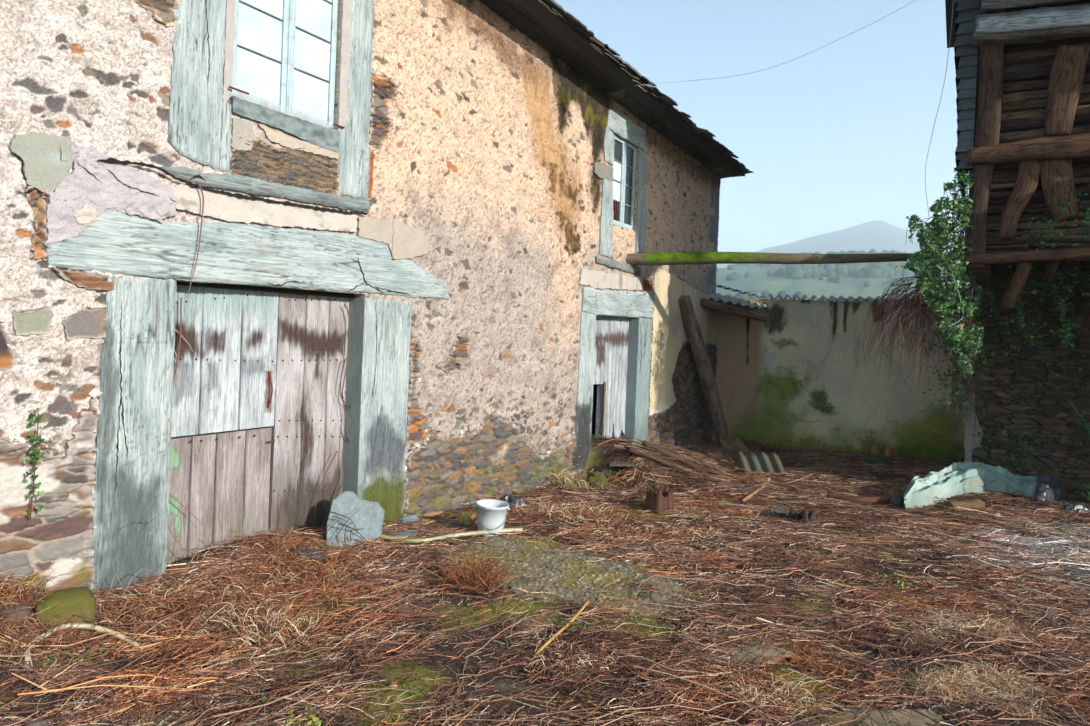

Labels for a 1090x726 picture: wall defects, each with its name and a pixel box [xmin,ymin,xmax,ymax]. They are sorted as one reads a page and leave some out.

spalling [133,0,182,28]
spalling [230,134,341,197]
spalling [369,65,402,155]
water stain [448,0,604,263]
spalling [24,186,115,291]
spalling [0,388,103,596]
water stain [367,418,404,474]
spalling [403,328,581,521]
spalling [647,341,714,449]
spalling [705,342,717,380]